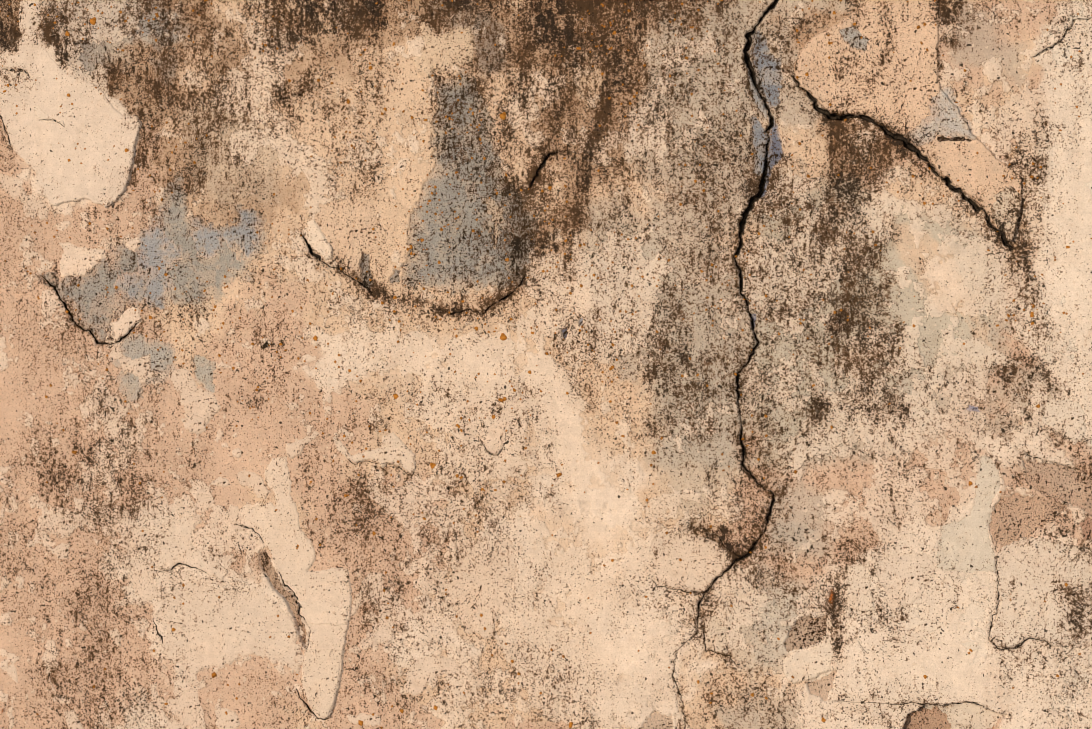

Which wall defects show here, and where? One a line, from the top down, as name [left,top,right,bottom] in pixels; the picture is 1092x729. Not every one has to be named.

peeling [0,0,143,220]
peeling [32,172,271,434]
peeling [307,198,387,289]
peeling [333,432,417,474]
peeling [390,22,536,296]
crack [652,0,778,729]
crack [793,76,1013,248]
peeling [906,85,976,147]
peeling [128,431,394,729]
peeling [438,536,519,642]
peeling [847,455,1092,651]
flaking render [902,701,1006,729]